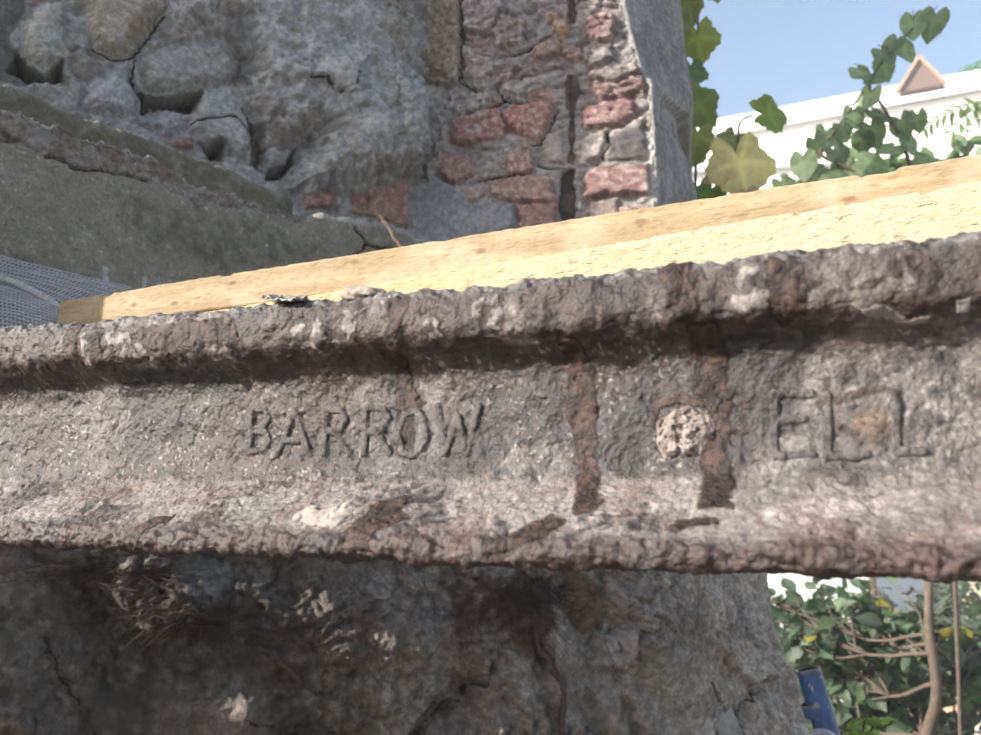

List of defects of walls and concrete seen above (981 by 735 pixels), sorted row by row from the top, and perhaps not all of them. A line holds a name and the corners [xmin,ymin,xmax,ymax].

crack [91,16,166,112]
crack [189,108,253,148]
crack [45,158,129,178]
crack [352,229,391,255]
corrosion [765,257,809,326]
corrosion [63,323,104,367]
corrosion [137,317,243,362]
corrosion [377,295,426,458]
corrosion [647,262,736,532]
corrosion [484,334,604,553]
corrosion [125,514,175,551]
corrosion [338,495,410,551]